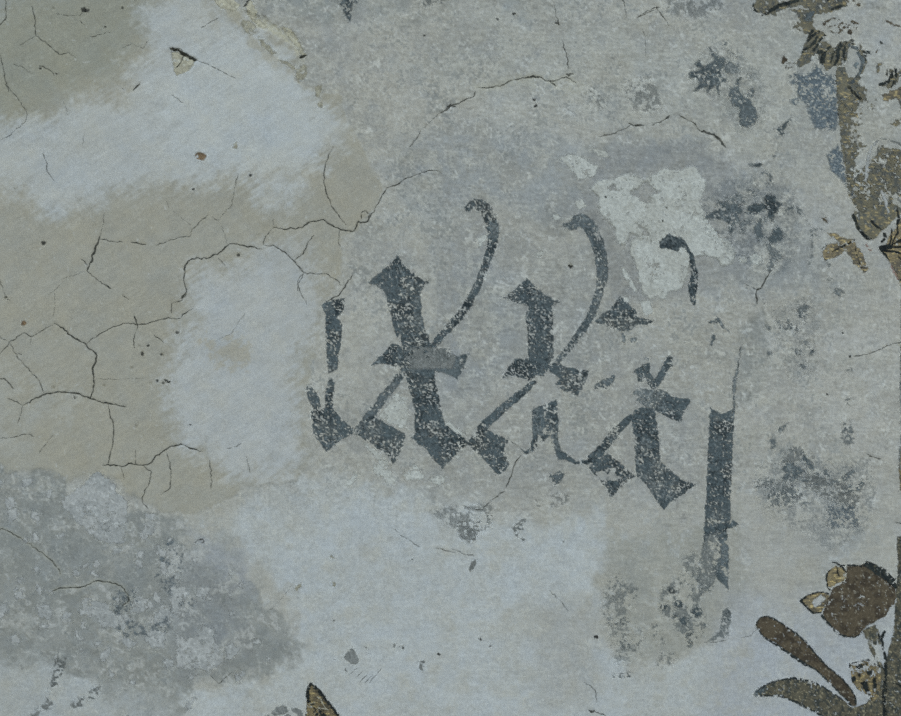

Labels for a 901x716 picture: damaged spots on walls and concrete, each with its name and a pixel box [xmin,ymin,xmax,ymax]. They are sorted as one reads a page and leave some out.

crack [1,7,76,138]
crack [170,47,235,78]
spalling [242,20,307,83]
peeling [559,147,762,317]
crack [0,154,441,509]
leakage [51,659,65,687]